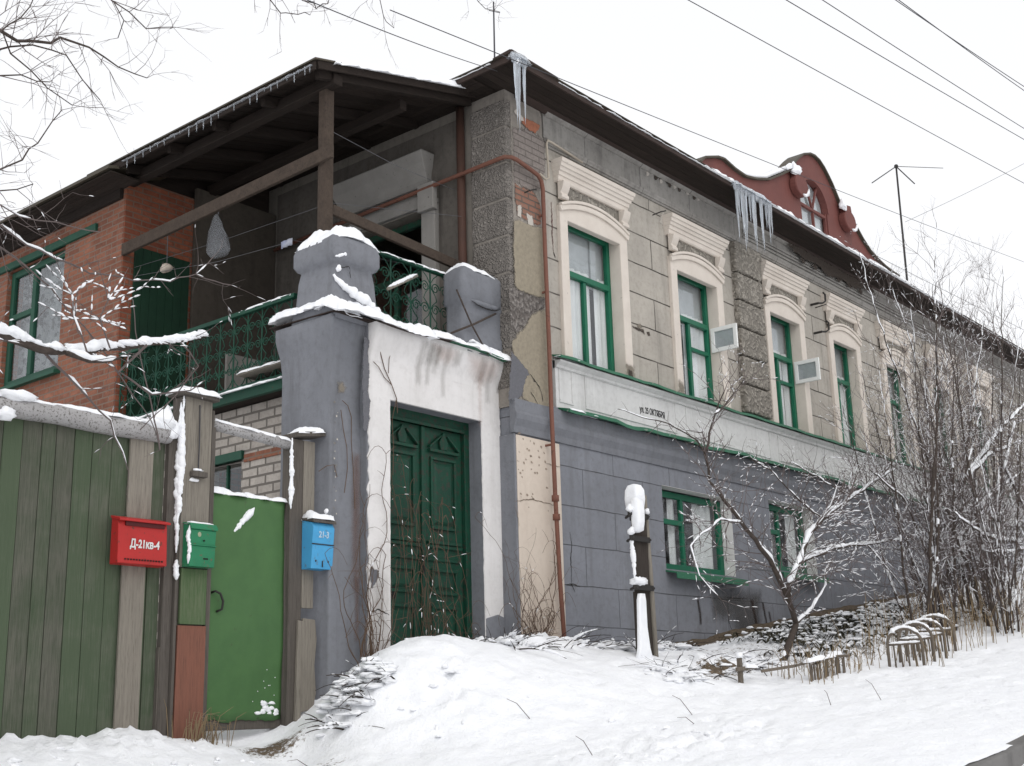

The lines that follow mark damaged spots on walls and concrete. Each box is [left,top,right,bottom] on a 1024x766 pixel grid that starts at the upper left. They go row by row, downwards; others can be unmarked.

flaking render [512,108,546,226]
flaking render [509,287,545,332]
peeling [508,353,529,400]